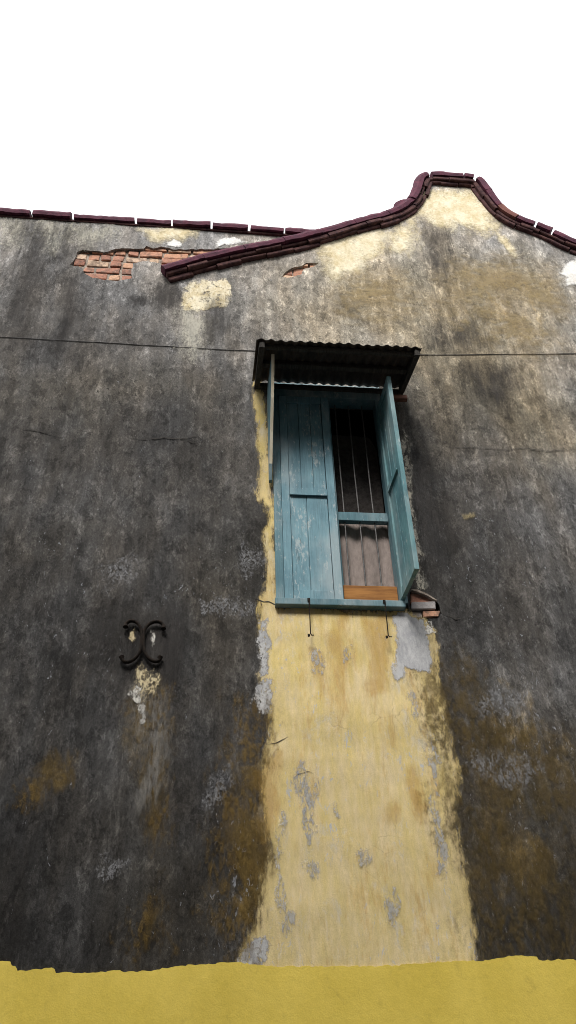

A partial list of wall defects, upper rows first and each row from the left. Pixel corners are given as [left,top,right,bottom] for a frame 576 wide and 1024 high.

flaking render [72,248,211,281]
flaking render [283,264,316,278]
leakage [130,619,179,678]
peeling [254,618,272,714]
peeling [391,589,440,681]
flaking render [128,668,167,805]
peeling [291,760,319,845]
peeling [237,936,269,965]